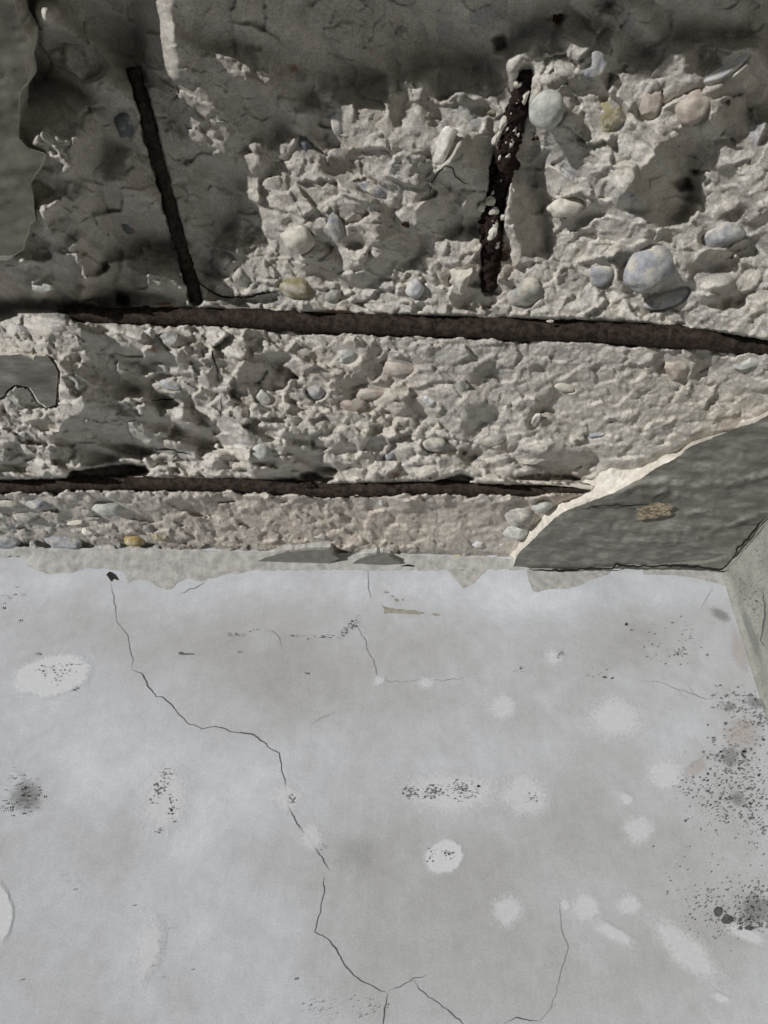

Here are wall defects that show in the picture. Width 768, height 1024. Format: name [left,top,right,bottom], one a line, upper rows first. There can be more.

rust [484,250,509,288]
spalling [0,0,768,592]
efflorescence [588,696,642,737]
mould [0,767,45,817]
crack [110,583,463,1024]
leakage [402,773,551,816]
leakage [649,684,768,866]
leakage [624,816,654,847]
efflorescence [493,896,522,926]
efflorescence [561,894,630,944]
leakage [656,854,768,979]
crack [509,903,568,1021]